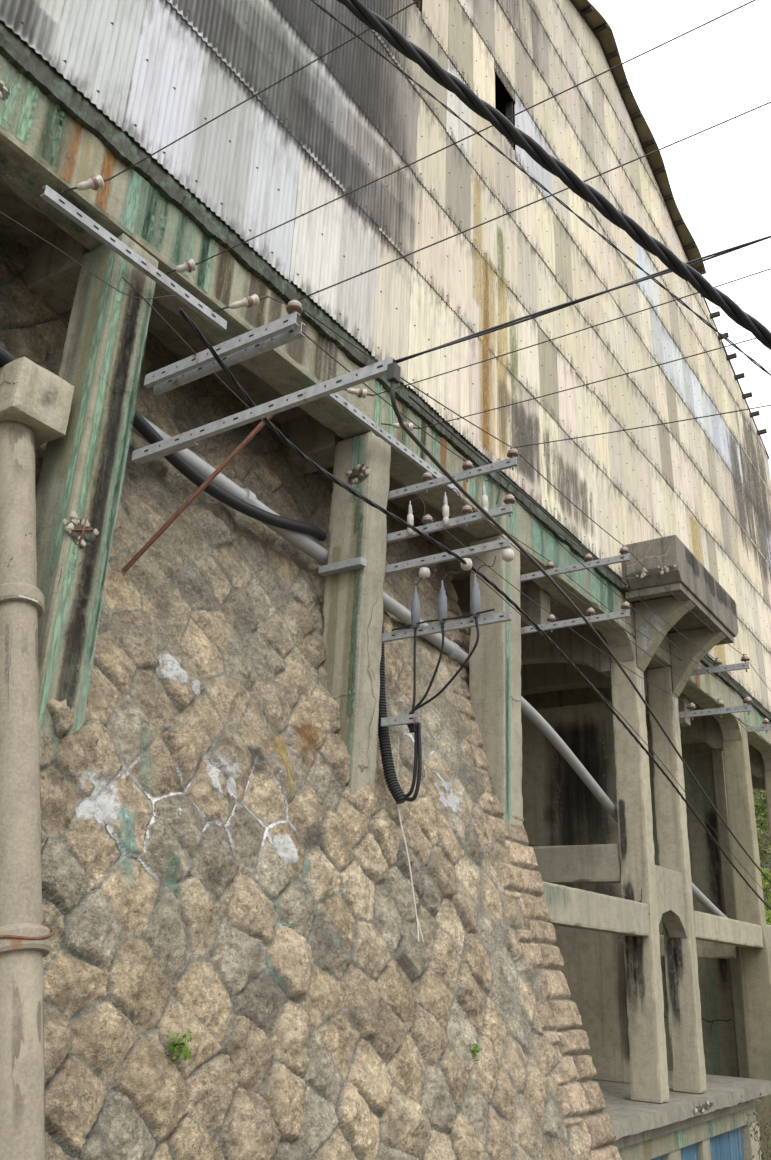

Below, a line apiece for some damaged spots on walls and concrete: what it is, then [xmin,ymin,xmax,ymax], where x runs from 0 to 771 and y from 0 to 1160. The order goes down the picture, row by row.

leakage [176,0,255,66]
leakage [274,0,393,123]
leakage [305,130,360,201]
leakage [122,169,232,306]
leakage [246,274,282,327]
leakage [287,314,338,380]
leakage [76,758,190,870]
leakage [199,736,325,863]